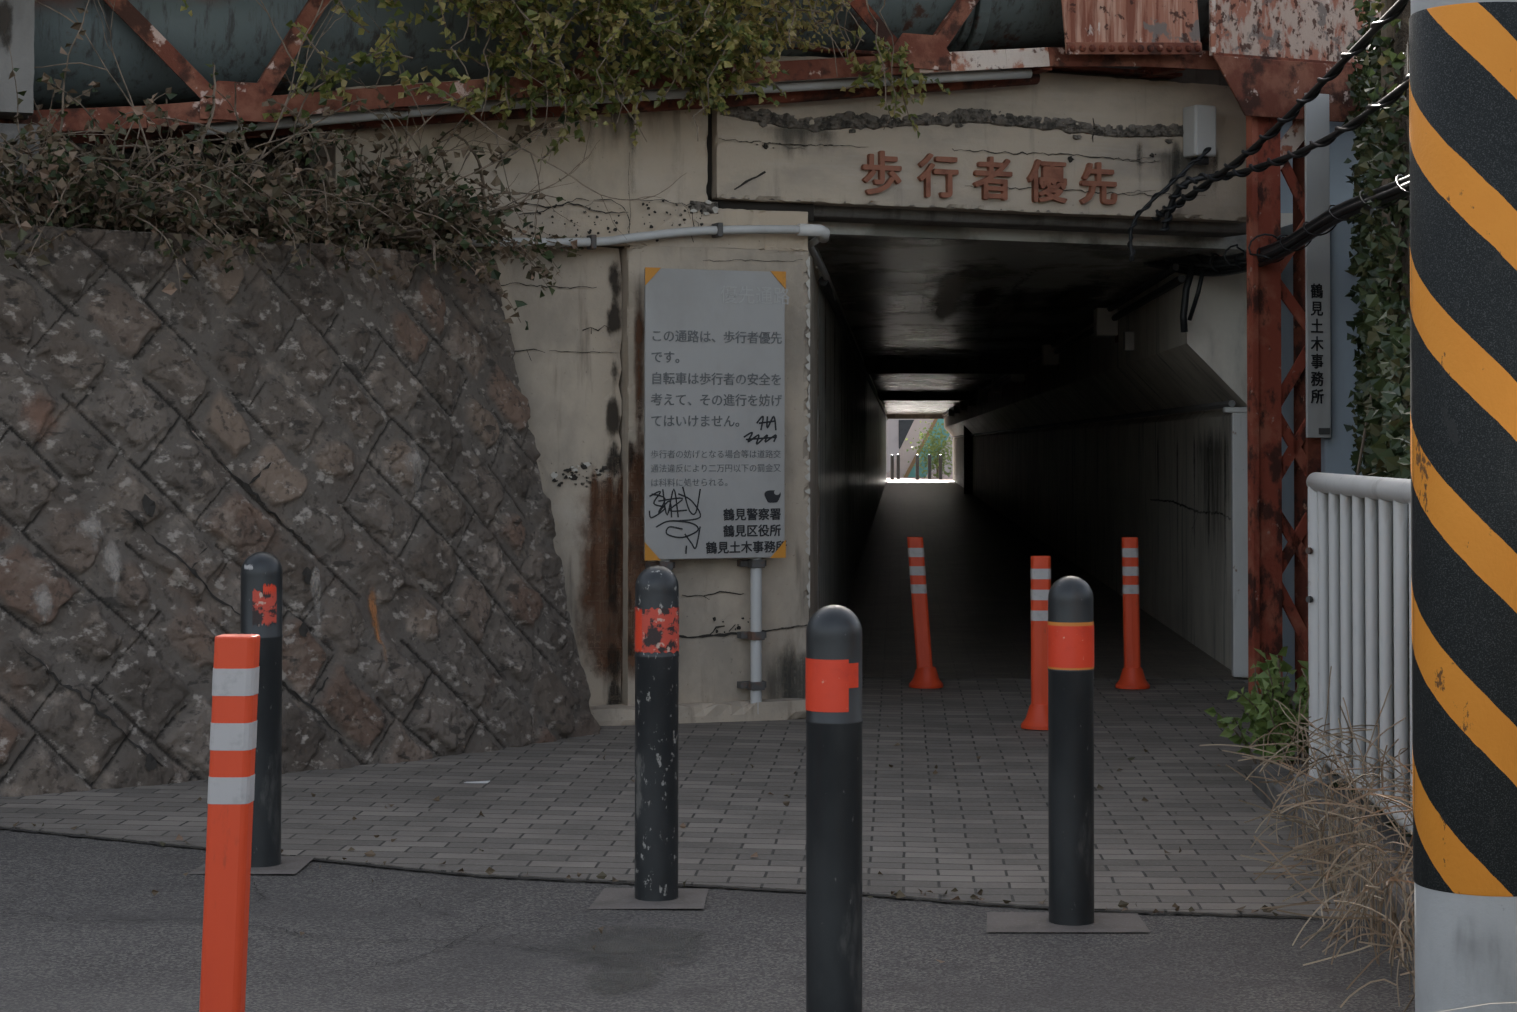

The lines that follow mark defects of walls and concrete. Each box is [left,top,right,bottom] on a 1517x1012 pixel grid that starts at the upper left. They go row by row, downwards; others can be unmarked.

rust [581,312,647,679]